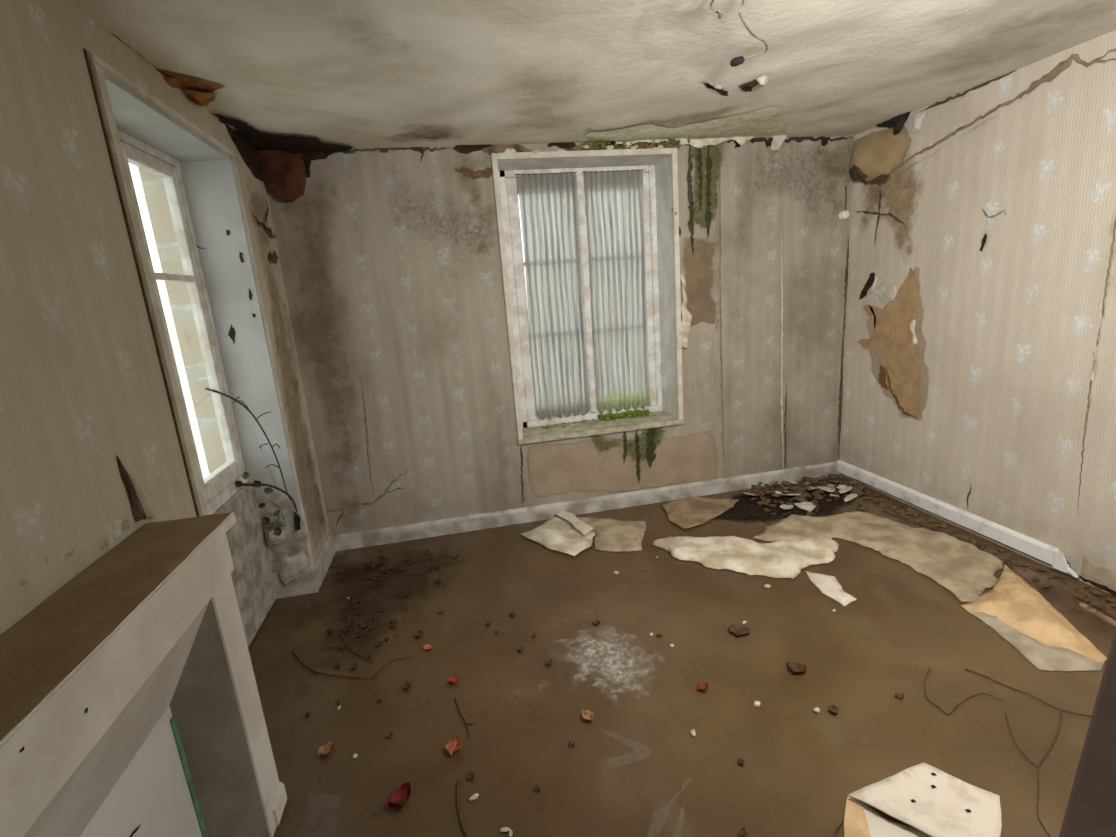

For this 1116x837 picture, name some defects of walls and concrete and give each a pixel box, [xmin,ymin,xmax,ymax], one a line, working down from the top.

flaking render [156,69,225,108]
crack [879,48,1116,190]
damp [454,167,493,179]
damp [855,152,916,246]
peeling [671,208,719,349]
peeling [856,268,928,421]
crack [1077,219,1116,512]
crack [117,456,155,522]
damp [528,432,717,497]